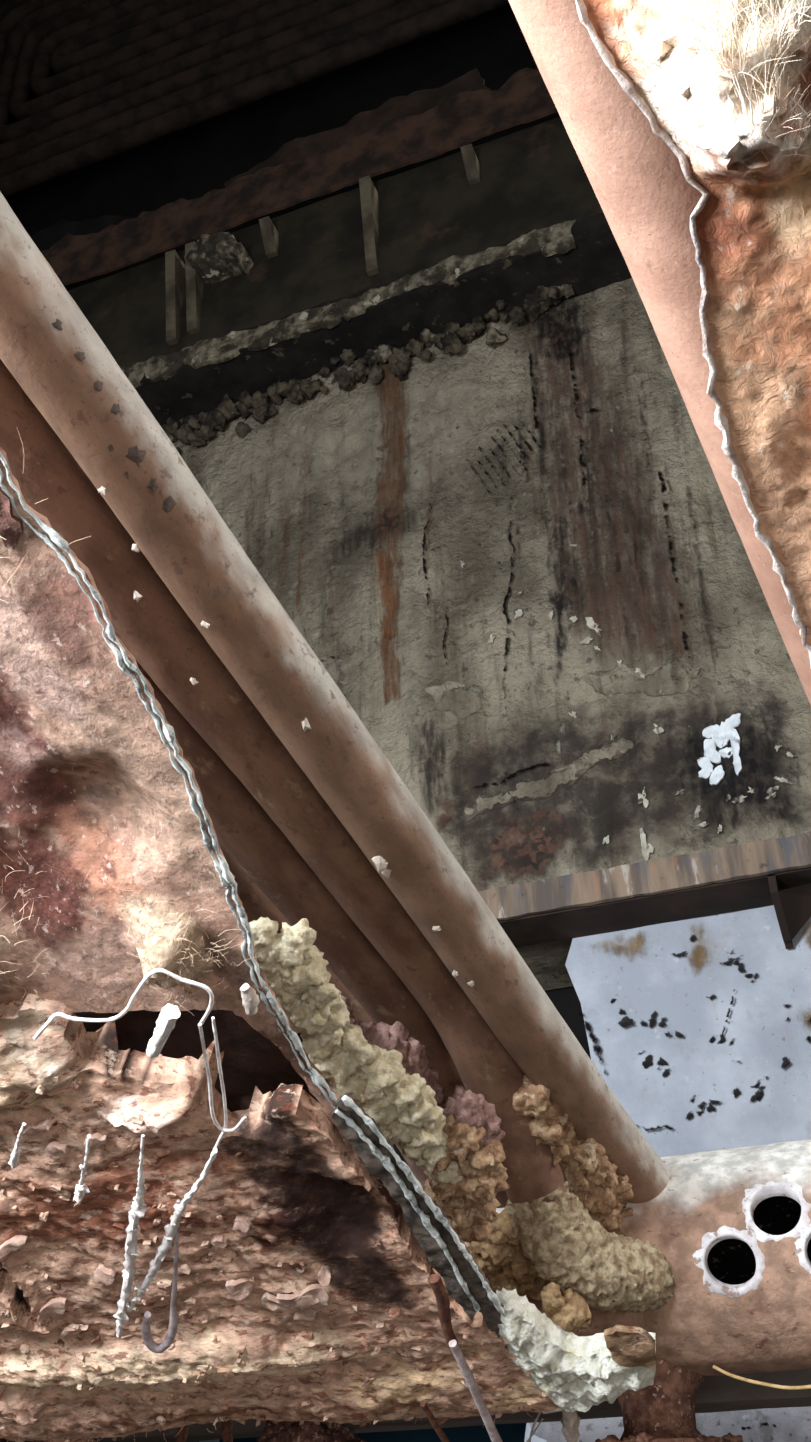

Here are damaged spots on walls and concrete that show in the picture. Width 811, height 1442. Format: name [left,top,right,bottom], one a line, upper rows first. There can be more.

rust [376,364,409,703]
crack [498,496,546,695]
leakage [517,299,713,669]
crack [465,763,554,809]
leakage [415,696,807,877]
rust [3,834,113,948]
peeling [35,1073,83,1095]
crack [0,1262,31,1313]
peeling [0,1235,103,1392]
peeling [5,1107,332,1341]
peeling [139,1345,251,1432]
peeling [363,1305,421,1356]